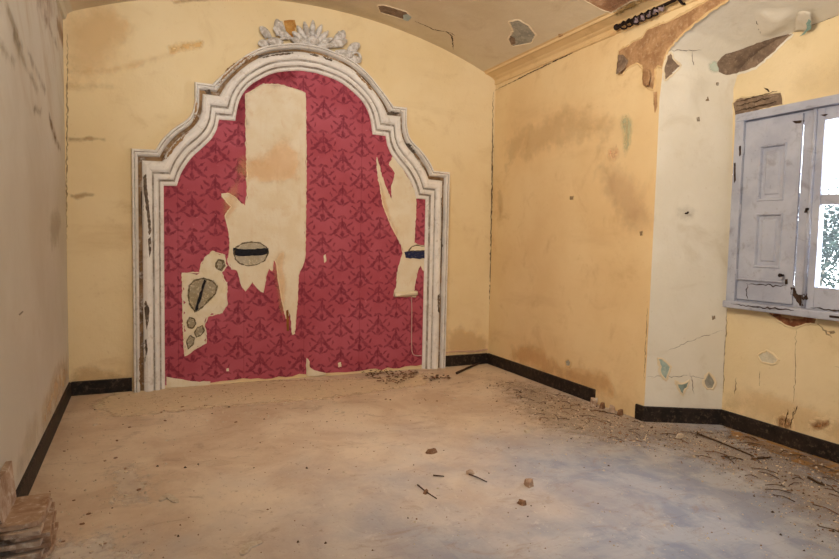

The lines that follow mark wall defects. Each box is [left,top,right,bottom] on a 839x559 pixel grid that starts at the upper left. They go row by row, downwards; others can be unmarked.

flaking render [376,4,412,21]
flaking render [584,0,637,14]
flaking render [508,19,537,47]
flaking render [616,0,729,112]
flaking render [716,8,838,86]
peeling [785,279,808,306]
flaking render [766,312,819,330]
peeling [657,357,690,396]
peeling [702,372,717,391]